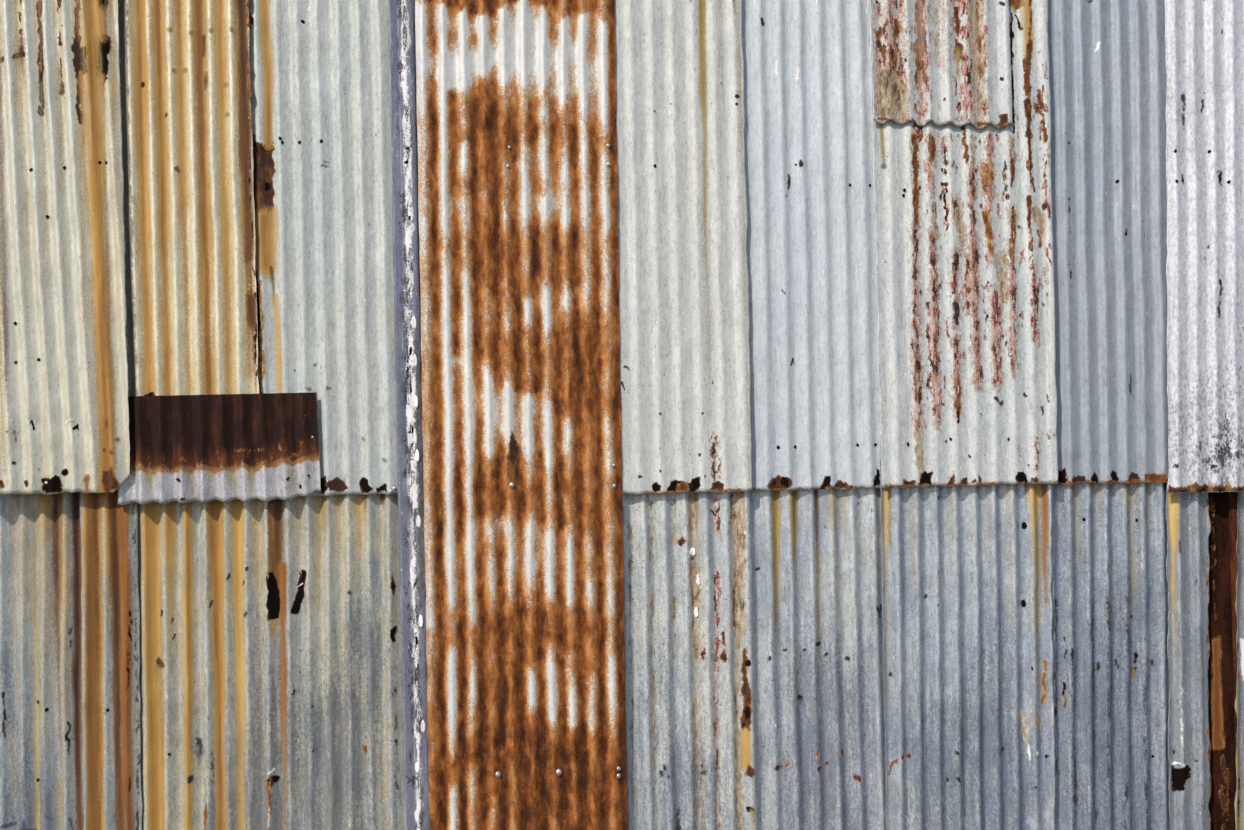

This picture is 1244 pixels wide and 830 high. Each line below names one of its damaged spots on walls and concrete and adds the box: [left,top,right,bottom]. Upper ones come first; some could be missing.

rust [0,0,364,830]
rust [415,0,681,830]
rust [871,0,1048,348]
rust [704,433,1244,830]